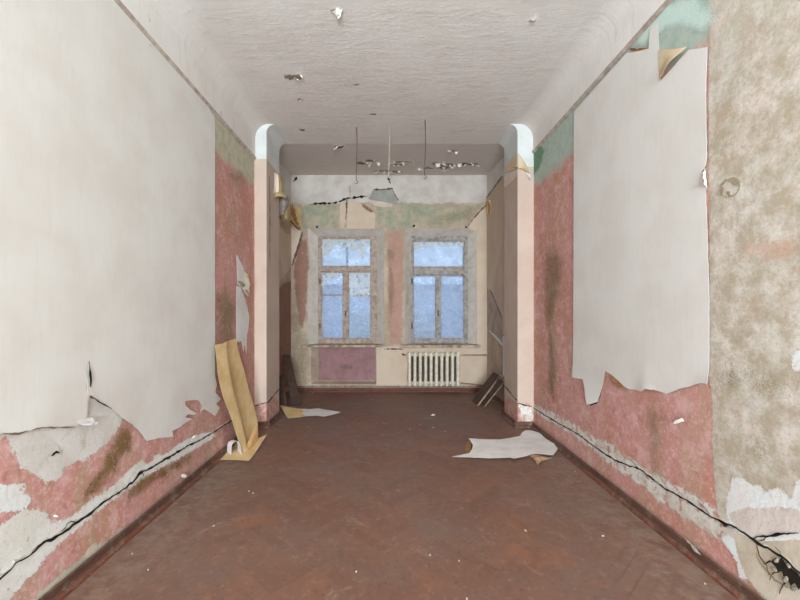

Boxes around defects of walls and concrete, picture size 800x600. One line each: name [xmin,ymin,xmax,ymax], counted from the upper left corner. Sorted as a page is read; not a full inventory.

peeling [236,254,250,352]
peeling [292,239,310,329]
crack [309,187,368,205]
peeling [355,150,479,175]
peeling [368,188,480,346]
leakage [542,245,565,399]
flaking render [0,399,123,484]
flaking render [0,432,216,600]
leakage [82,425,135,502]
crack [0,419,232,580]
crack [504,386,800,588]
flaking render [518,404,800,600]